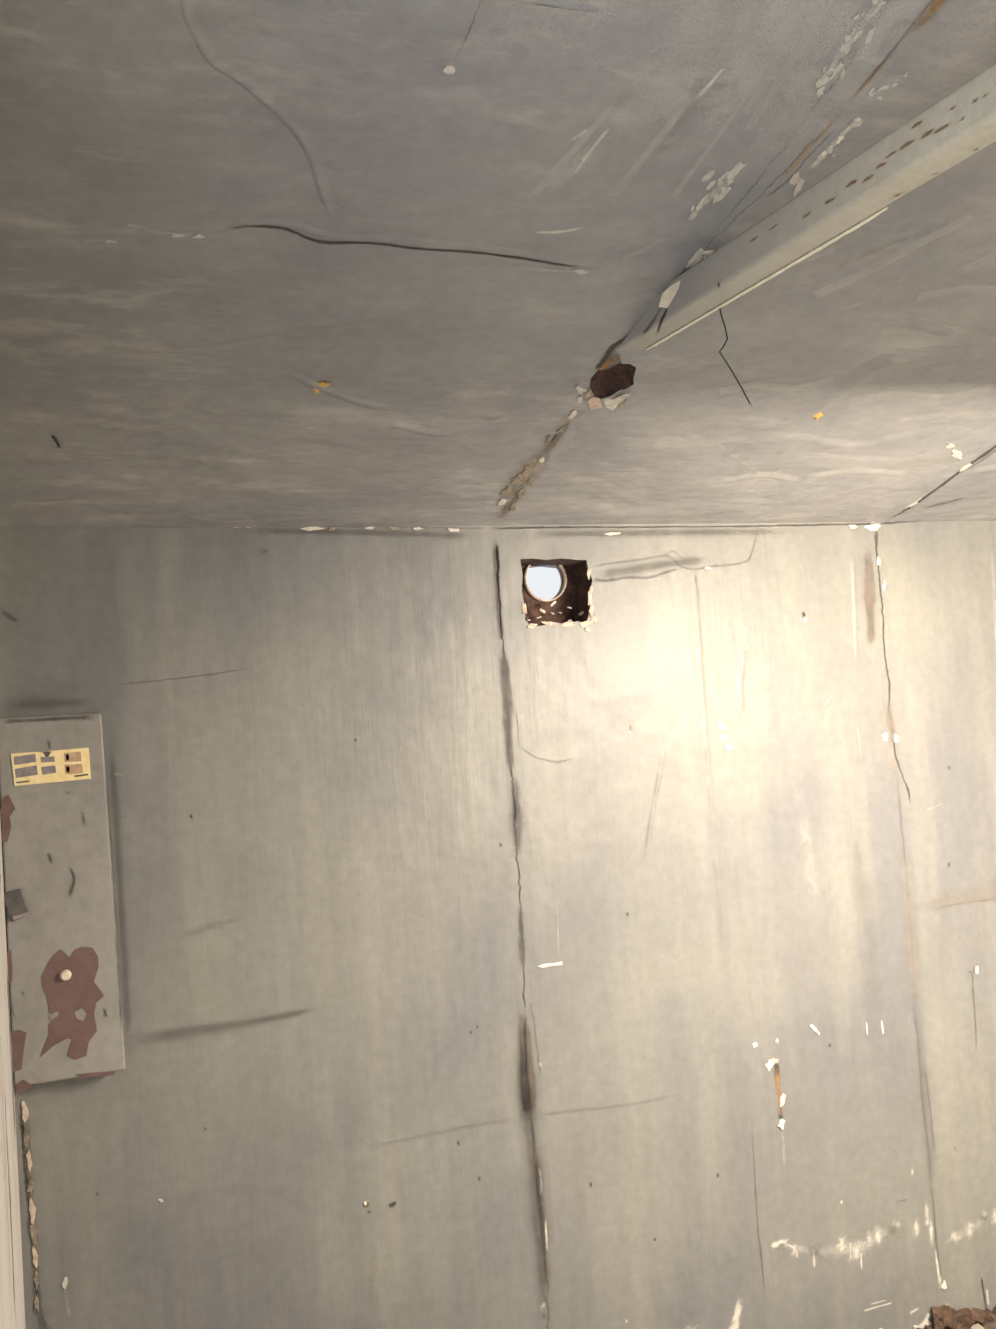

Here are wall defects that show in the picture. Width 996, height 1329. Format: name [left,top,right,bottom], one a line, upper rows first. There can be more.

crack [443,1,481,74]
peeling [806,0,895,96]
peeling [789,72,908,197]
crack [82,217,592,274]
crack [211,435,996,1328]